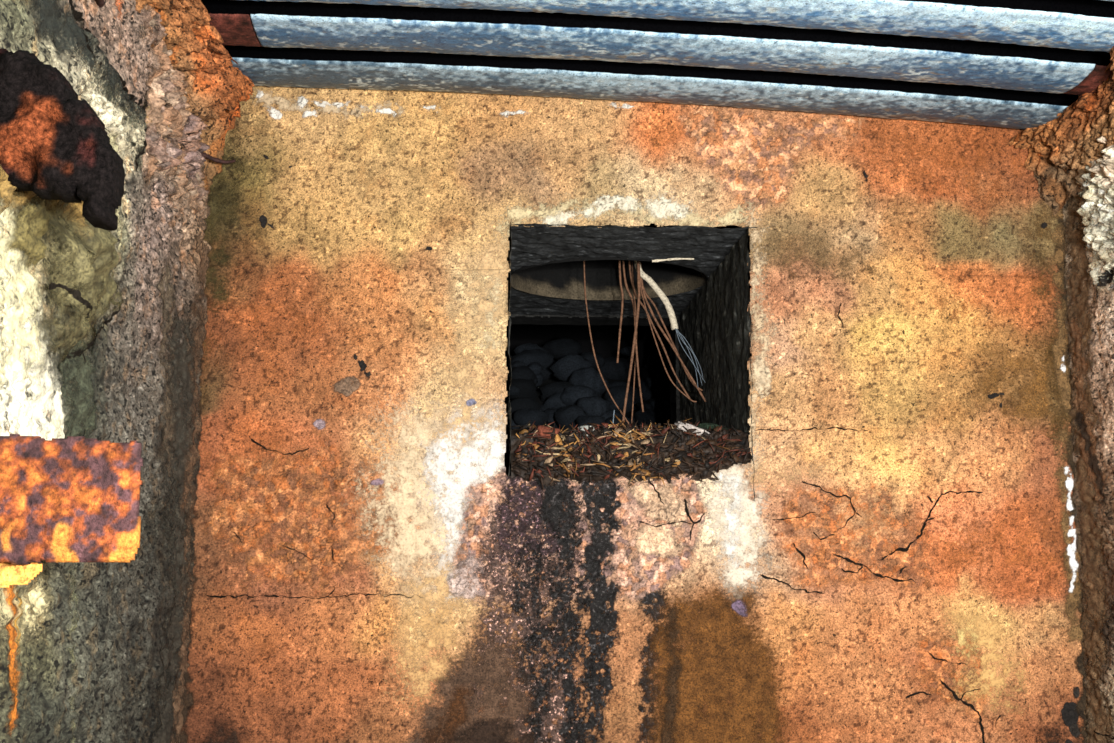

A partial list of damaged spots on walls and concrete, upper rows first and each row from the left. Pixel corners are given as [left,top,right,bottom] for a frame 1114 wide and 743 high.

water stain [204,129,246,300]
water stain [151,262,209,743]
crack [250,438,310,455]
crack [205,504,422,599]
water stain [356,195,871,743]
crack [760,481,983,594]
water stain [975,208,1114,685]
rust [0,562,43,729]
crack [906,652,1001,743]
water stain [943,596,1025,708]
water stain [1040,723,1083,743]